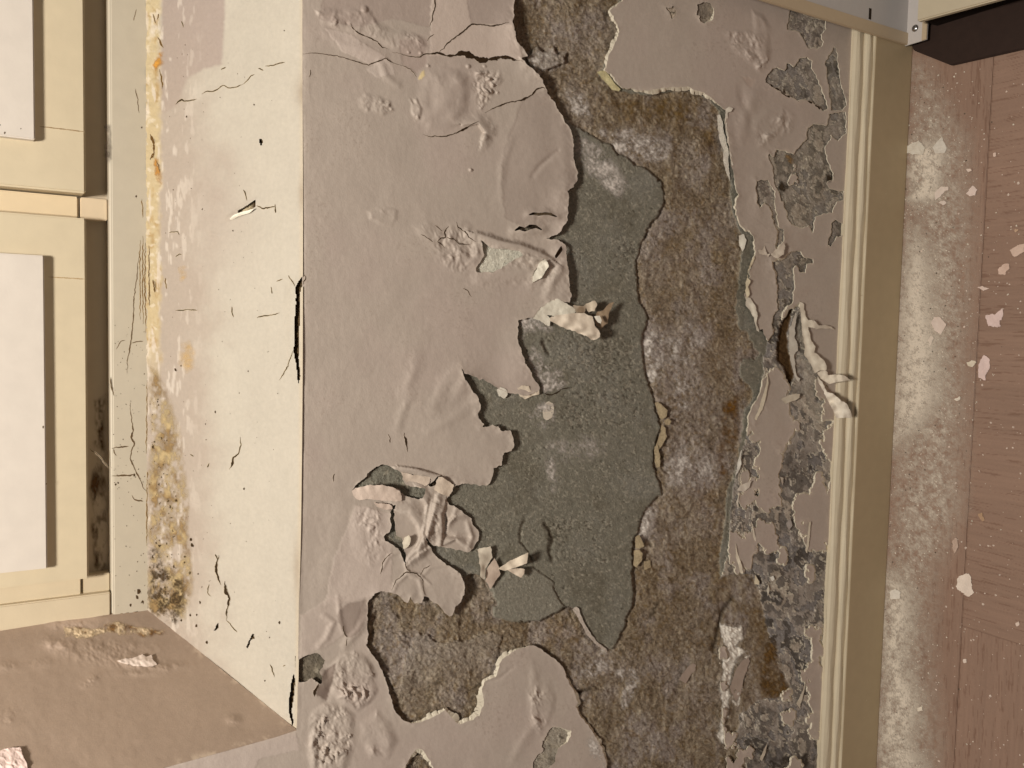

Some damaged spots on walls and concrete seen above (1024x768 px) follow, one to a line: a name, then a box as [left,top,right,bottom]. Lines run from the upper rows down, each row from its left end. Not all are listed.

crack [133,0,520,104]
crack [423,87,544,137]
crack [150,134,160,172]
crack [243,190,276,213]
crack [231,274,306,383]
spalling [348,0,852,768]
crack [190,439,242,469]
mould [149,372,194,622]
crack [207,554,237,632]